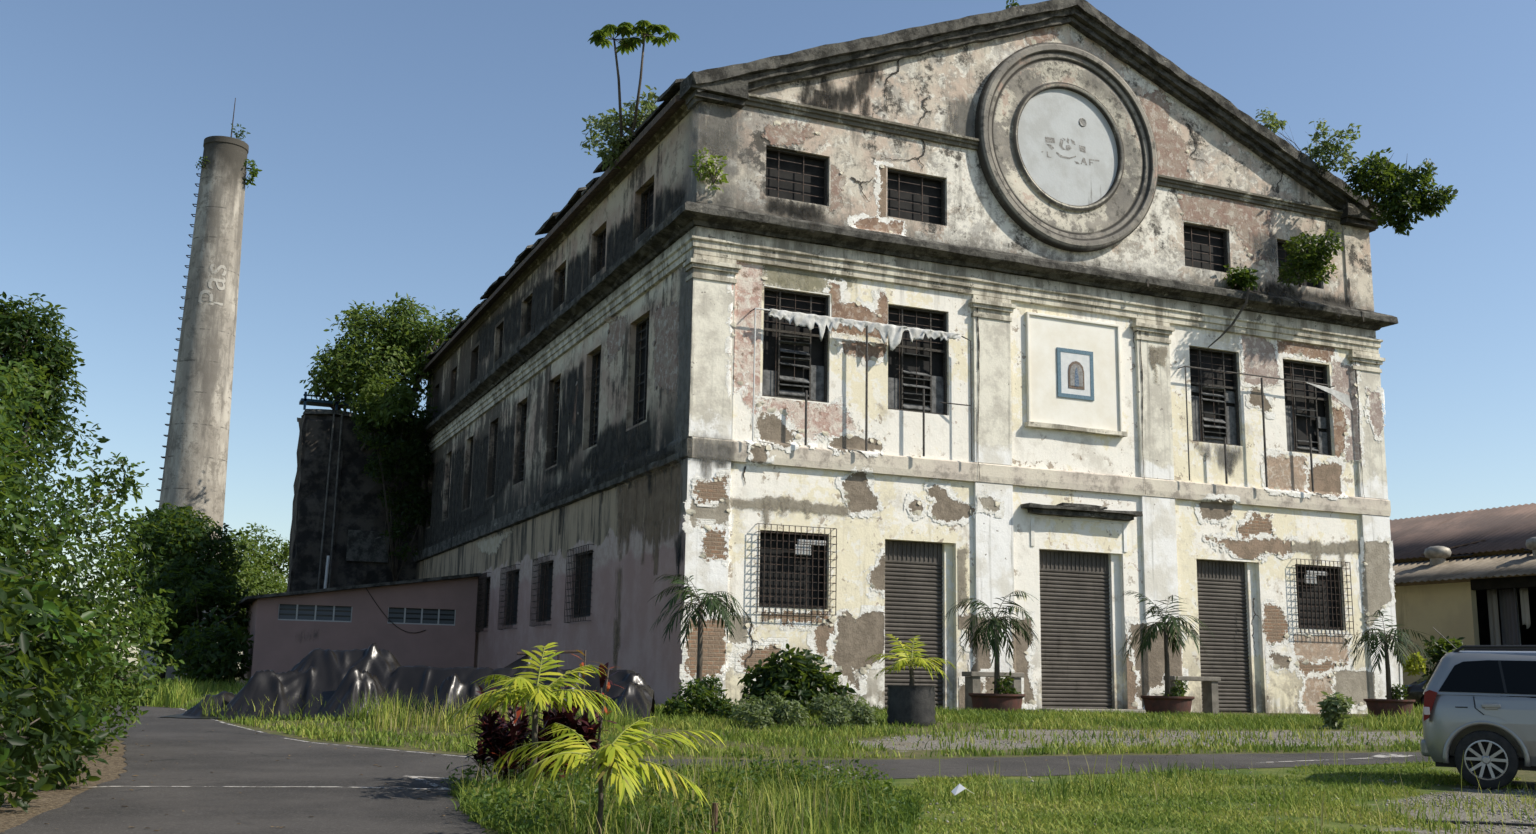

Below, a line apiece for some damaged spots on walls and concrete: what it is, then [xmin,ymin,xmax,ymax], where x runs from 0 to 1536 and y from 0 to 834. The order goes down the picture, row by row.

water stain [801,65,882,117]
water stain [476,214,633,363]
water stain [424,425,515,548]
water stain [540,268,734,670]
peeling [682,261,890,568]
flaking render [904,478,1005,527]
peeling [1194,334,1386,564]
flaking render [679,548,885,696]
flaking render [1261,535,1396,714]